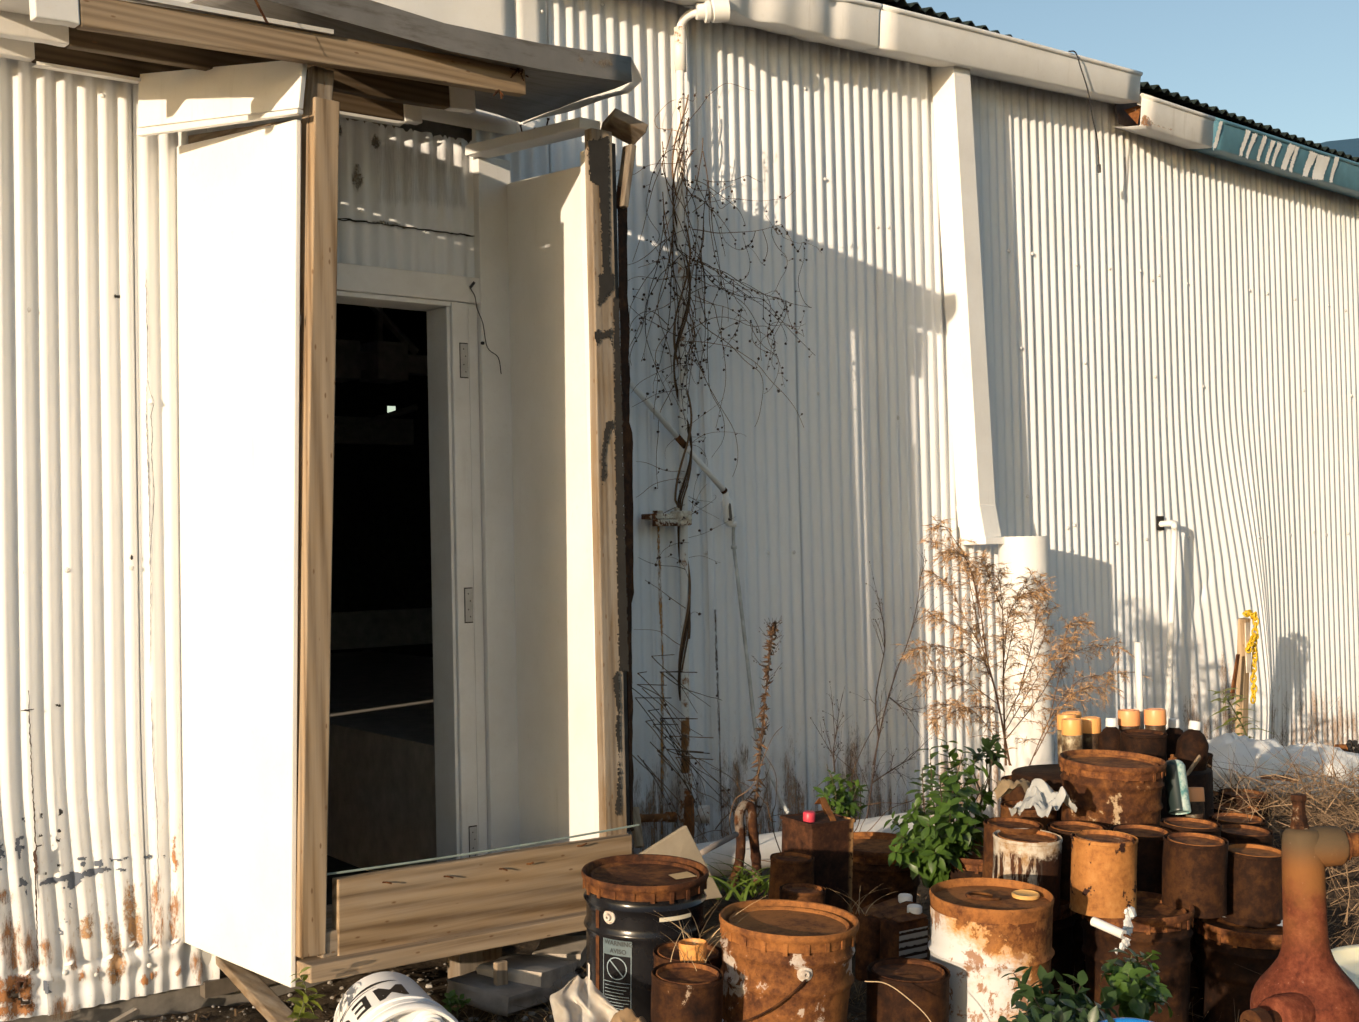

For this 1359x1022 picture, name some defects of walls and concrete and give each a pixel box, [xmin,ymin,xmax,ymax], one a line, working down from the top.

rust [617,186,679,854]
peeling [0,809,63,870]
crack [28,691,38,967]
rust [0,837,179,1021]
peeling [19,854,165,935]